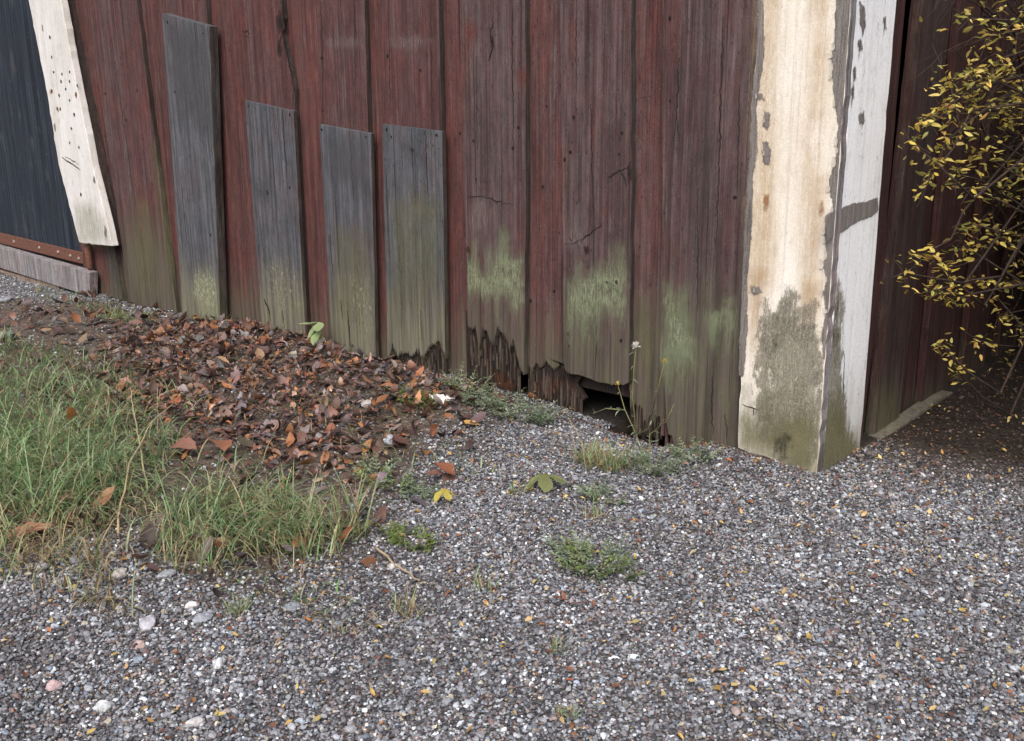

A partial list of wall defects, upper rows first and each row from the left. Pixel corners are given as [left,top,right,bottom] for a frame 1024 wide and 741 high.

crack [467,196,512,205]
crack [564,24,632,251]
peeling [738,0,878,471]